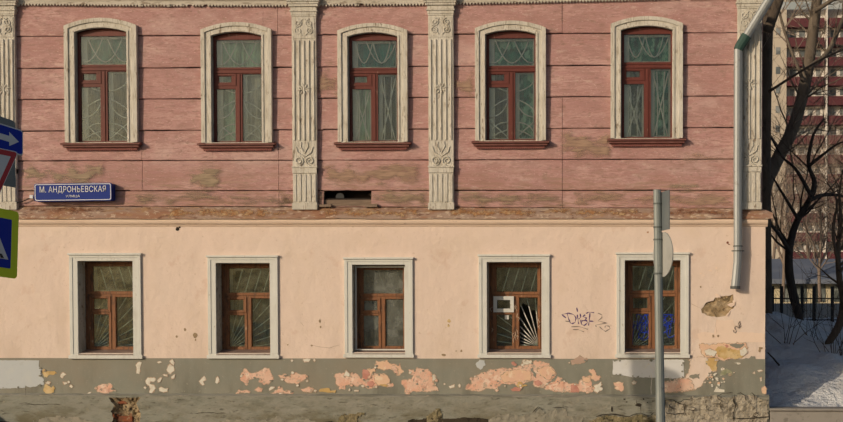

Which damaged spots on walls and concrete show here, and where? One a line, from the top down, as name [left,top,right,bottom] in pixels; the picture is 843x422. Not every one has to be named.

spalling [701,294,735,317]
peeling [37,367,74,393]
spalling [88,359,176,422]
peeling [236,355,603,395]
spalling [589,335,769,422]
spalling [408,408,488,422]